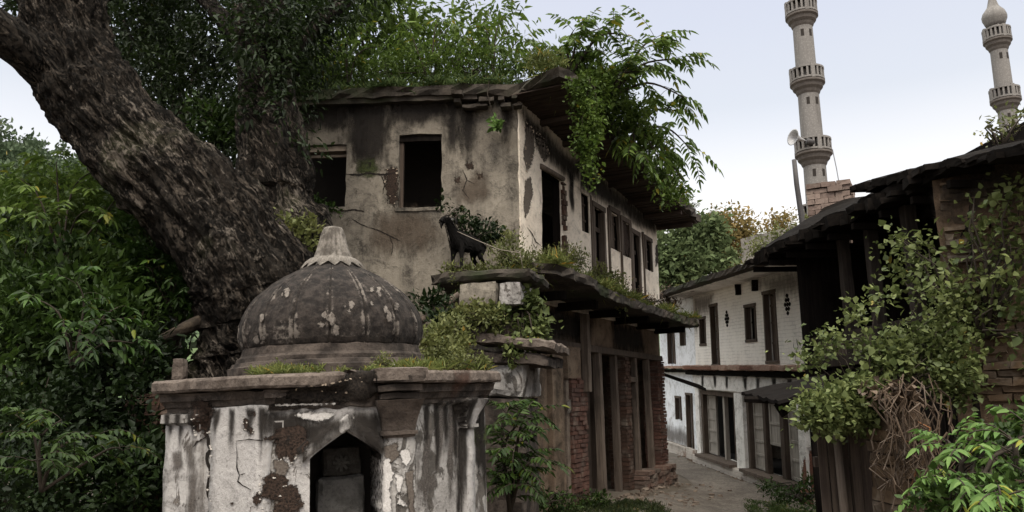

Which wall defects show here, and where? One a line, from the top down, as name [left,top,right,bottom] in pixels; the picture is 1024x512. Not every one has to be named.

leakage [299,100,479,166]
spalling [384,167,400,208]
flaking render [523,122,550,218]
peeling [240,313,266,347]
peeling [317,300,355,336]
peeling [370,285,400,322]
leakage [164,411,198,512]
leakage [213,409,234,439]
crack [193,427,283,501]
spalling [243,377,362,512]
peeling [370,442,415,512]
leakage [417,396,490,512]